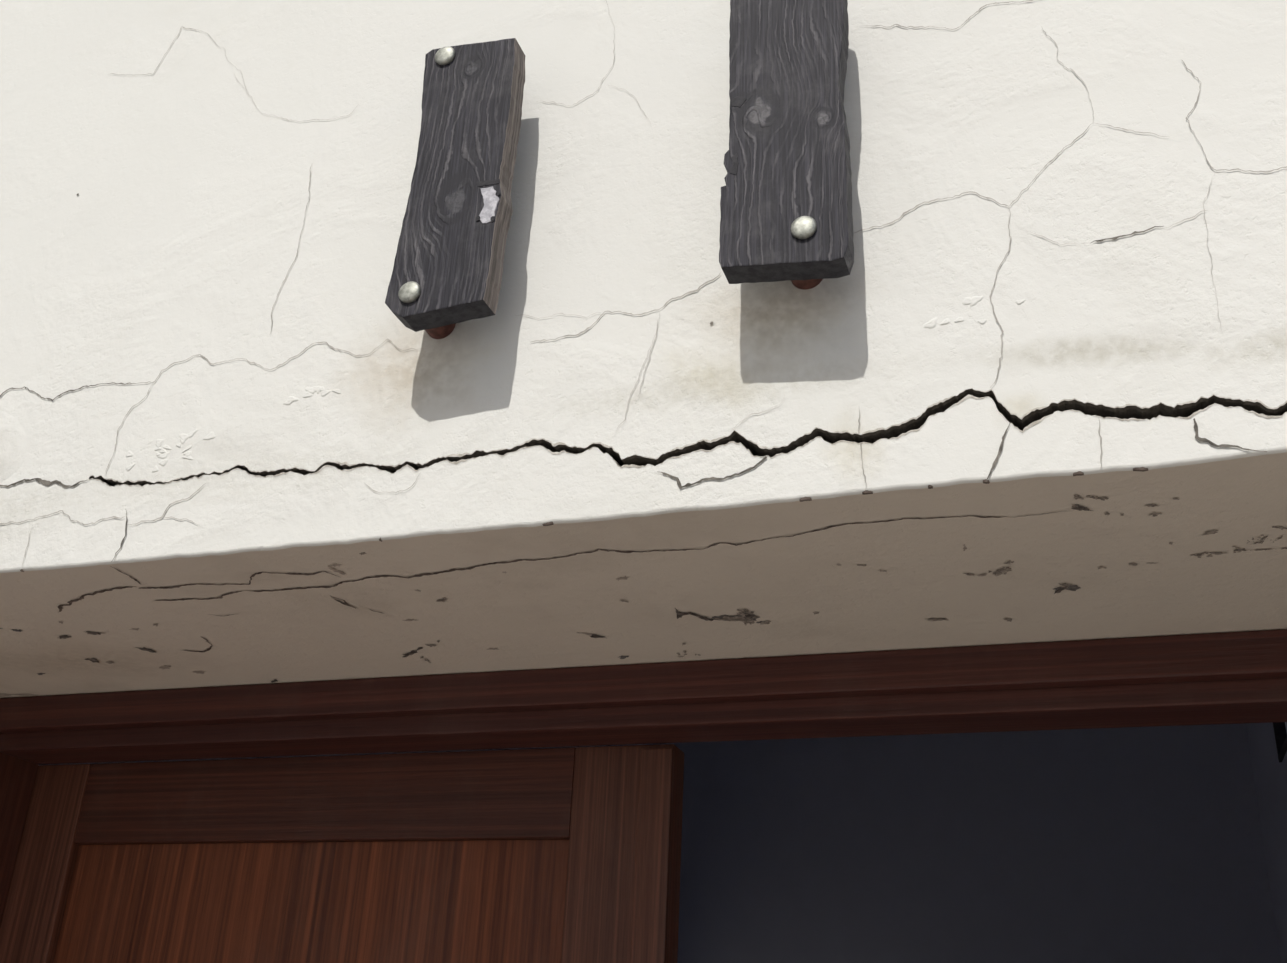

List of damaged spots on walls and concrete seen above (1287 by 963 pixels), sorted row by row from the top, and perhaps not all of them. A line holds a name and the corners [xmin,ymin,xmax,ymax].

crack [0,0,1287,652]
spalling [1071,494,1124,516]
spalling [1190,526,1287,558]
spalling [963,560,1014,576]
spalling [1054,583,1081,594]
spalling [675,608,771,625]